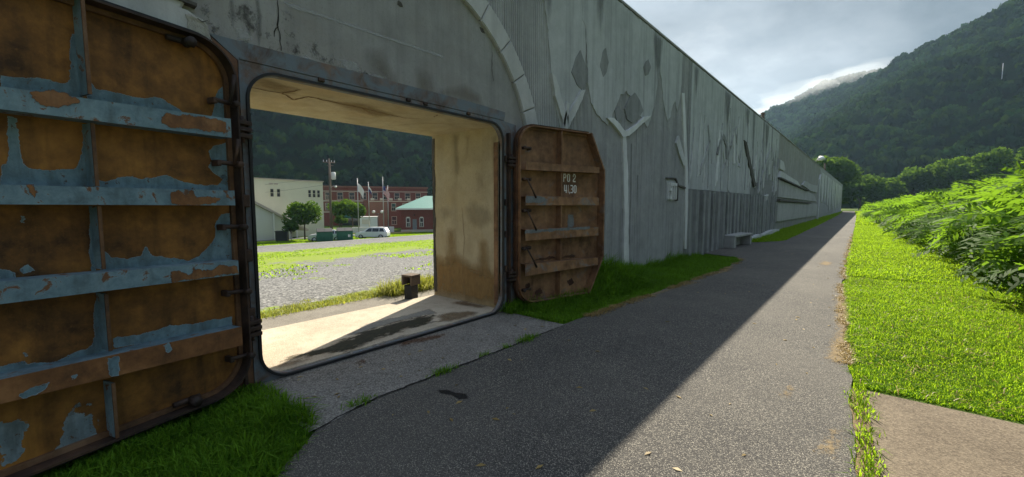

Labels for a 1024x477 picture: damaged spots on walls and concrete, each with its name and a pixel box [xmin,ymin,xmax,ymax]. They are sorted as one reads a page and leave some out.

spalling [185,14,212,41]
crack [274,0,282,51]
peeling [0,34,182,112]
peeling [0,116,228,190]
peeling [88,213,232,271]
peeling [0,265,35,279]
peeling [0,300,232,377]
peeling [19,382,50,399]
peeling [0,419,29,467]
peeling [55,402,99,450]